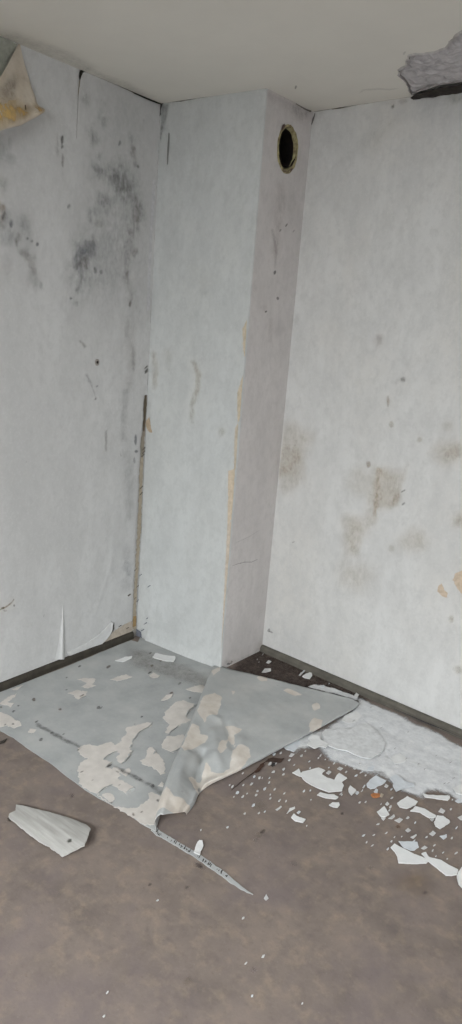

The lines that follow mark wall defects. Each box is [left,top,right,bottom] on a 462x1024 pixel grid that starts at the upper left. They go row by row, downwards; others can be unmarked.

peeling [0,36,45,131]
flaking render [397,30,462,95]
peeling [67,618,148,656]